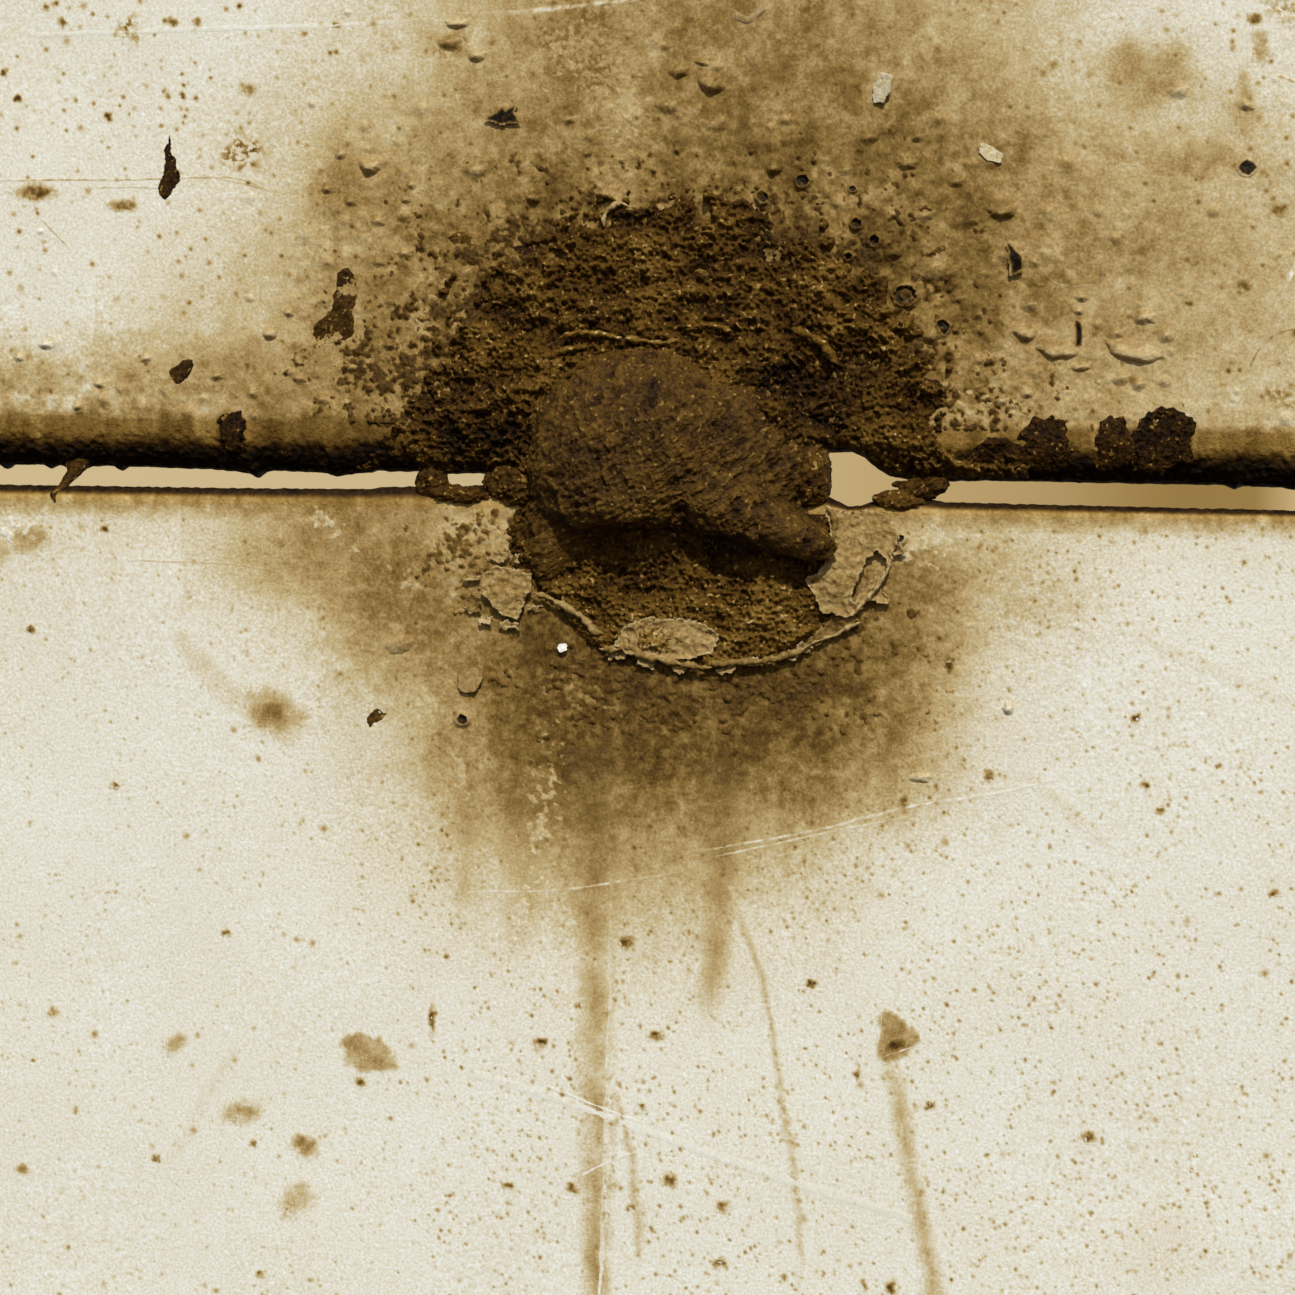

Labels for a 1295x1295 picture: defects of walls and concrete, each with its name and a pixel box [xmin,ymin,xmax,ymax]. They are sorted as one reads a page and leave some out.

rust [0,0,1295,479]
peeling [462,505,907,675]
rust [0,500,1295,1295]